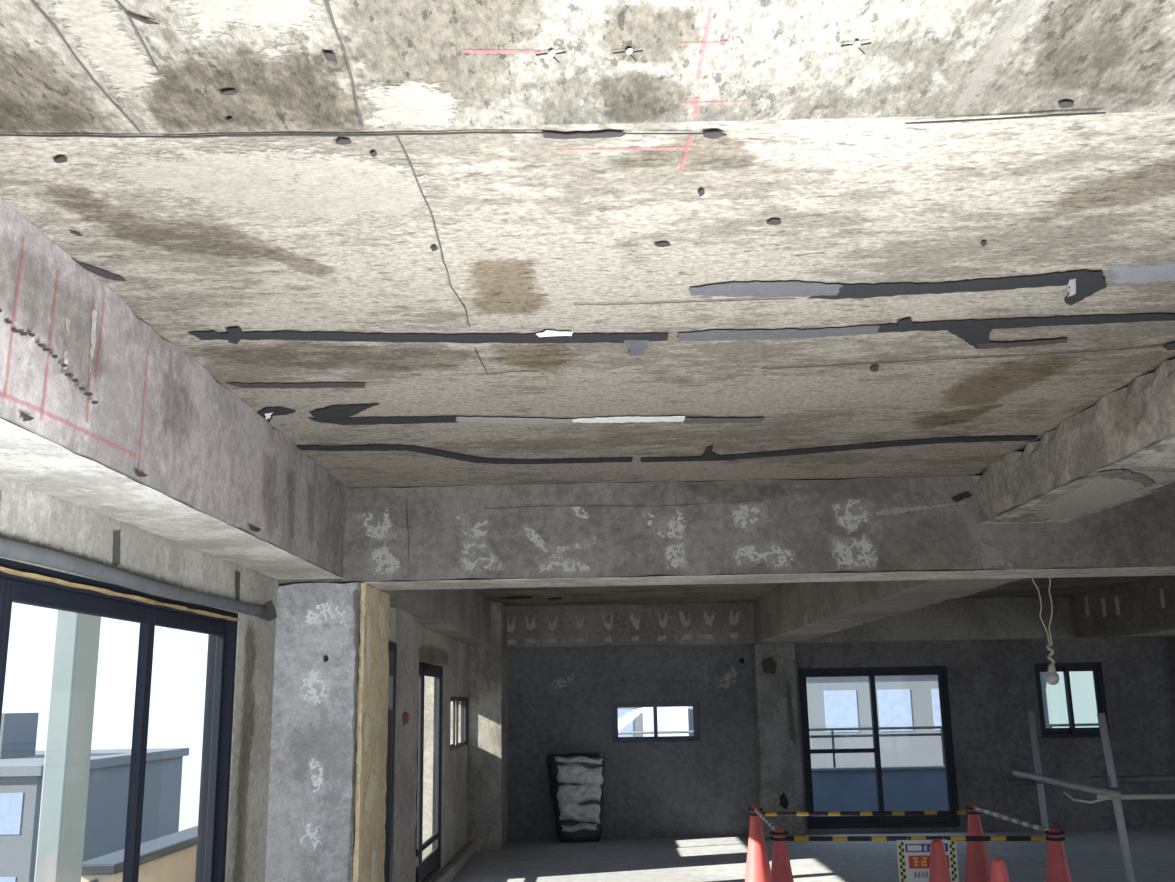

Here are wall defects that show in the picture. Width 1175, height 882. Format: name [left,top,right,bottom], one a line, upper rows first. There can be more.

crack [0,0,1175,375]
efflorescence [357,510,400,574]
water stain [456,514,501,571]
efflorescence [524,527,595,573]
efflorescence [643,511,687,569]
efflorescence [732,504,766,532]
efflorescence [734,545,793,568]
efflorescence [832,499,877,570]
water stain [305,602,344,626]
water stain [300,667,329,705]
water stain [309,758,324,793]
water stain [299,822,322,849]